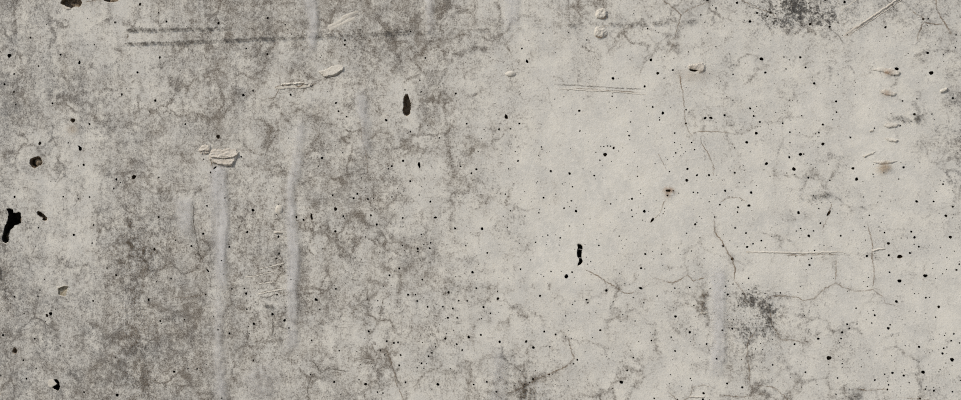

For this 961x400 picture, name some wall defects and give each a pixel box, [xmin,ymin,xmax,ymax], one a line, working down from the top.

flaking render [319,65,344,78]
flaking render [198,144,239,167]
spalling [1,208,22,244]